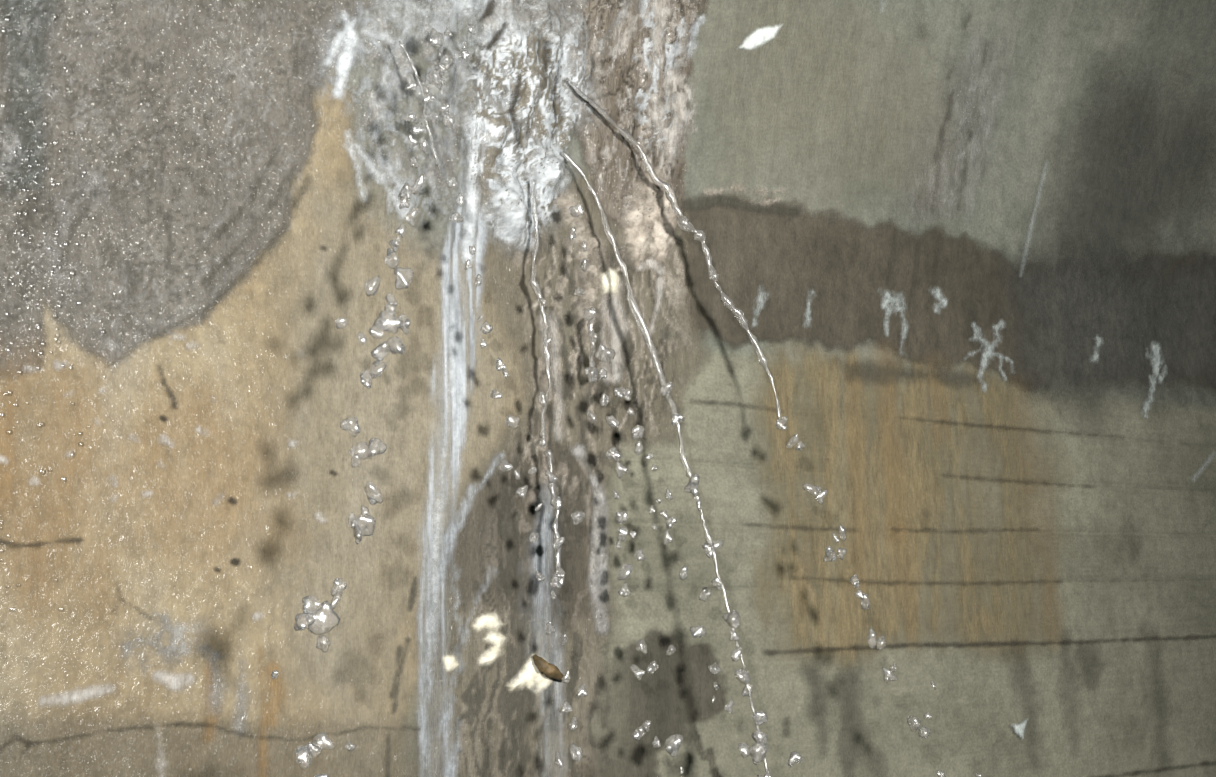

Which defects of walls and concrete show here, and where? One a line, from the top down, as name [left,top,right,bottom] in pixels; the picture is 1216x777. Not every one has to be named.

peeling [658,68,693,143]
peeling [602,269,619,294]
leakage [420,0,1216,777]
corrosion [0,65,532,777]
peeling [444,656,458,671]
peeling [474,614,505,664]
peeling [509,655,552,693]
crack [694,730,720,777]